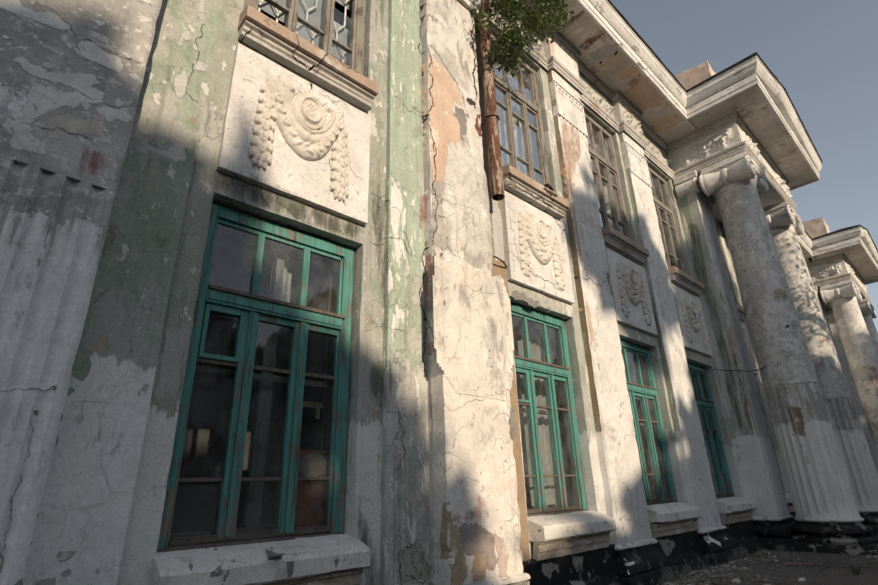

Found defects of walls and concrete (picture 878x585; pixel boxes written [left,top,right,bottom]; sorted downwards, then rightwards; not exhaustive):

peeling [0,0,70,30]
peeling [66,40,123,73]
crack [172,24,204,102]
peeling [6,56,132,155]
crack [371,1,478,374]
peeling [416,57,482,312]
peeling [67,348,91,396]
peeling [785,406,806,437]
crack [0,414,34,573]
crack [398,539,426,585]
peeling [397,508,434,585]
peeling [440,502,510,585]